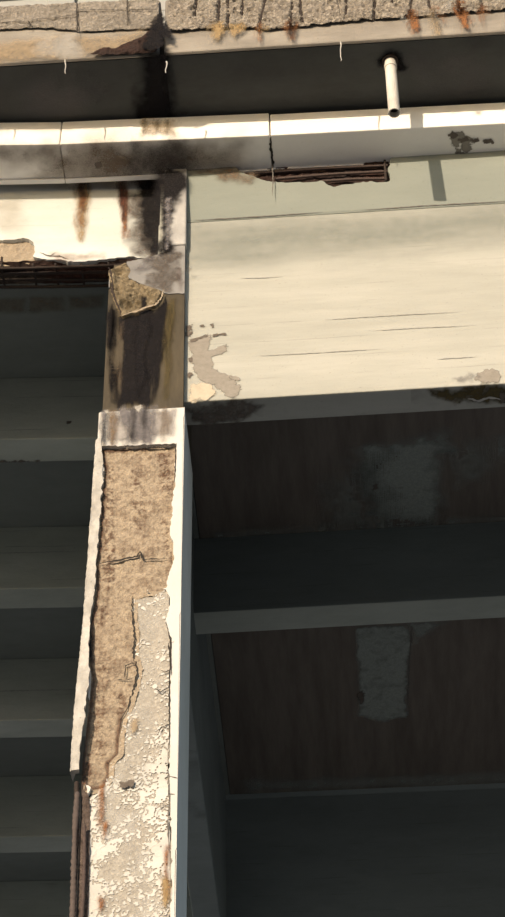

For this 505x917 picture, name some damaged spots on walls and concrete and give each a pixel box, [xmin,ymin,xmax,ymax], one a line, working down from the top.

corrosion [451,1,469,29]
water stain [0,36,58,60]
peeling [448,131,494,154]
spalling [245,159,390,187]
corrosion [76,182,89,240]
corrosion [116,181,128,234]
water stain [55,13,229,445]
spalling [0,242,165,319]
peeling [185,324,242,397]
water stain [188,399,261,425]
spalling [69,444,176,917]
corrosion [99,785,107,836]